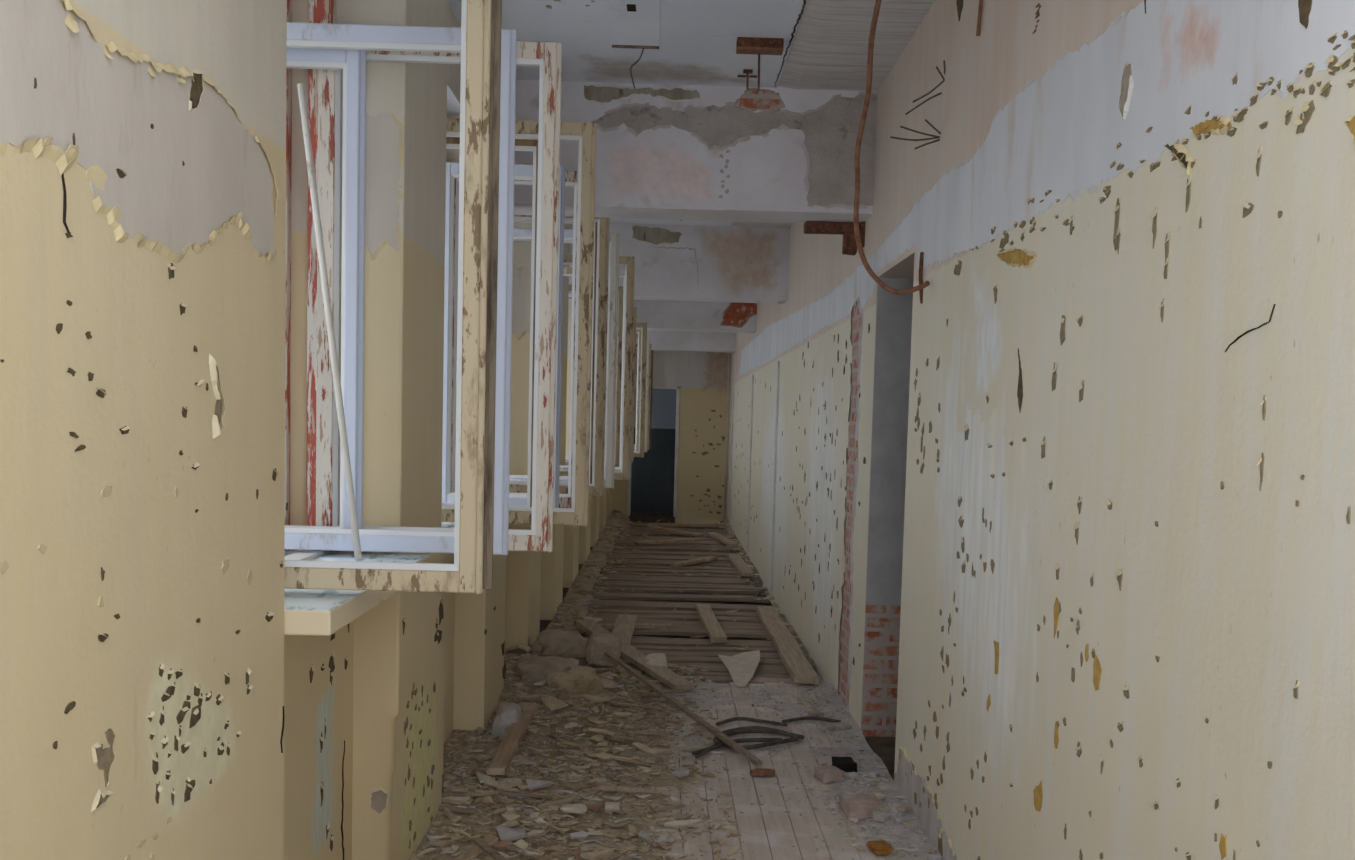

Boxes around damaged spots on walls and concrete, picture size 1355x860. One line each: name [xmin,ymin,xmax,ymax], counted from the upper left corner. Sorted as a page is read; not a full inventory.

peeling [0,0,278,279]
flaking render [584,83,877,209]
peeling [631,225,682,246]
crack [1225,304,1276,352]
peeling [720,0,1355,860]
peeling [245,664,253,695]
peeling [124,663,241,860]
flaking render [369,787,390,814]
peeling [404,681,436,849]